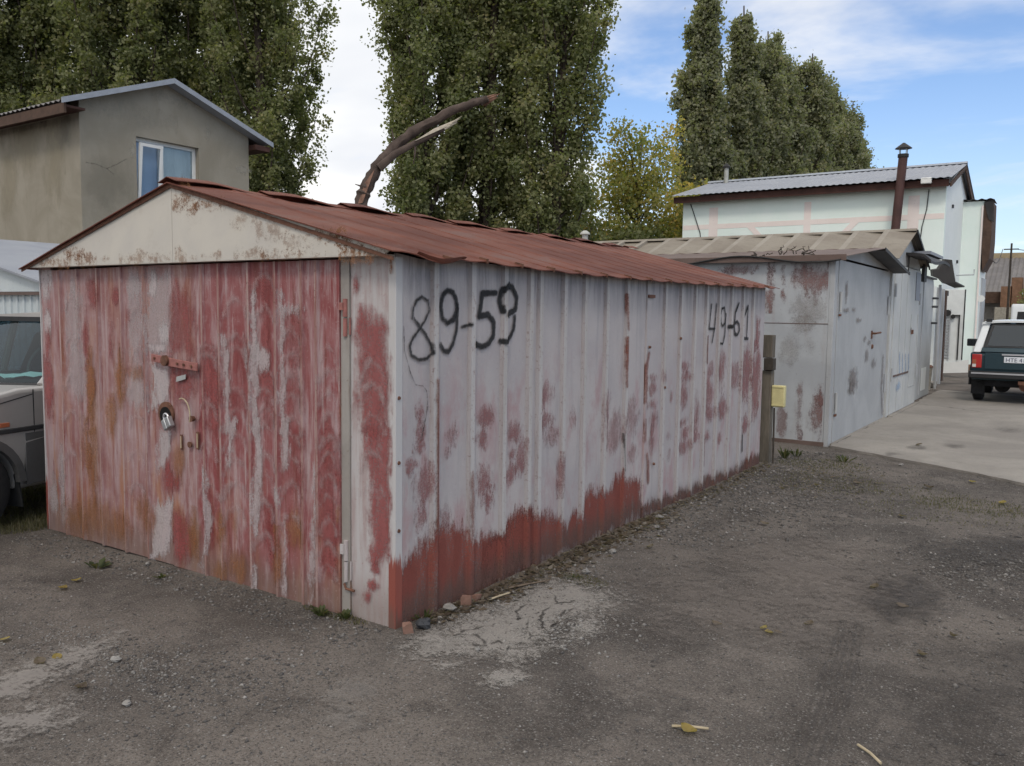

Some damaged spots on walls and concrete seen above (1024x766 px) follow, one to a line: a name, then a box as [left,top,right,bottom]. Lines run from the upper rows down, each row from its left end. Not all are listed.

rust [172,177,222,216]
peeling [40,270,54,418]
peeling [150,430,212,564]
peeling [148,270,236,466]
peeling [245,273,305,596]
peeling [355,306,393,601]
rust [725,263,829,314]